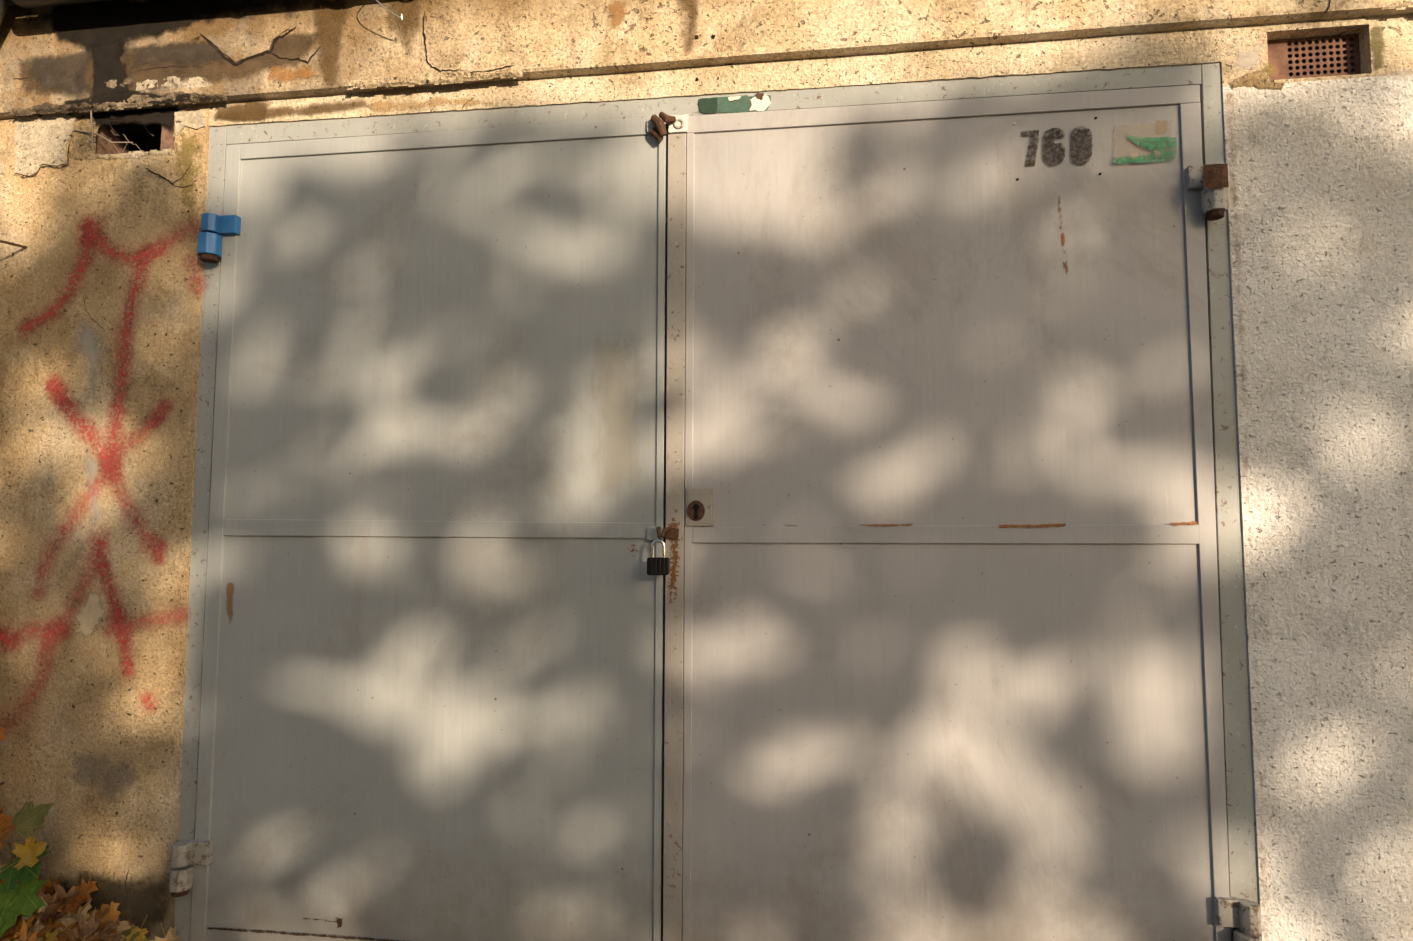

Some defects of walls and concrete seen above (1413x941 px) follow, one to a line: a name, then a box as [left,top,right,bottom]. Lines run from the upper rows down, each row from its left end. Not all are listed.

crack [130,27,320,73]
peeling [0,77,227,178]
rust [667,518,680,604]